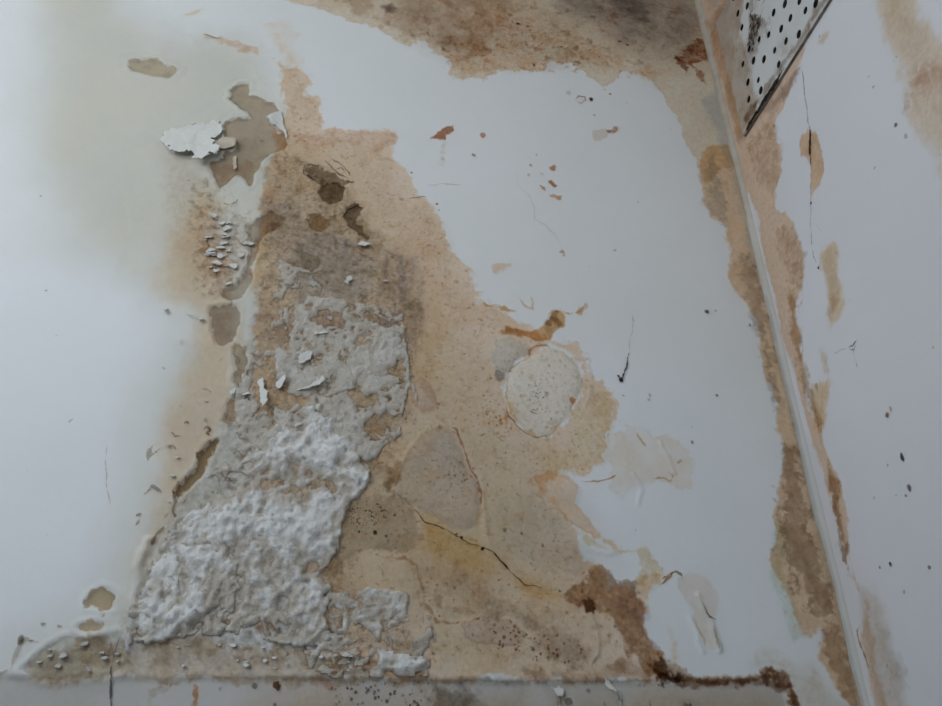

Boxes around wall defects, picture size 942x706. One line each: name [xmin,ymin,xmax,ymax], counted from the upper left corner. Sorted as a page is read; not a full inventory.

peeling [160,120,238,169]
peeling [205,213,254,272]
peeling [298,350,313,364]
peeling [229,375,286,406]
damp [128,259,437,705]
crack [421,517,560,591]
crack [107,657,115,706]
damp [653,658,681,687]